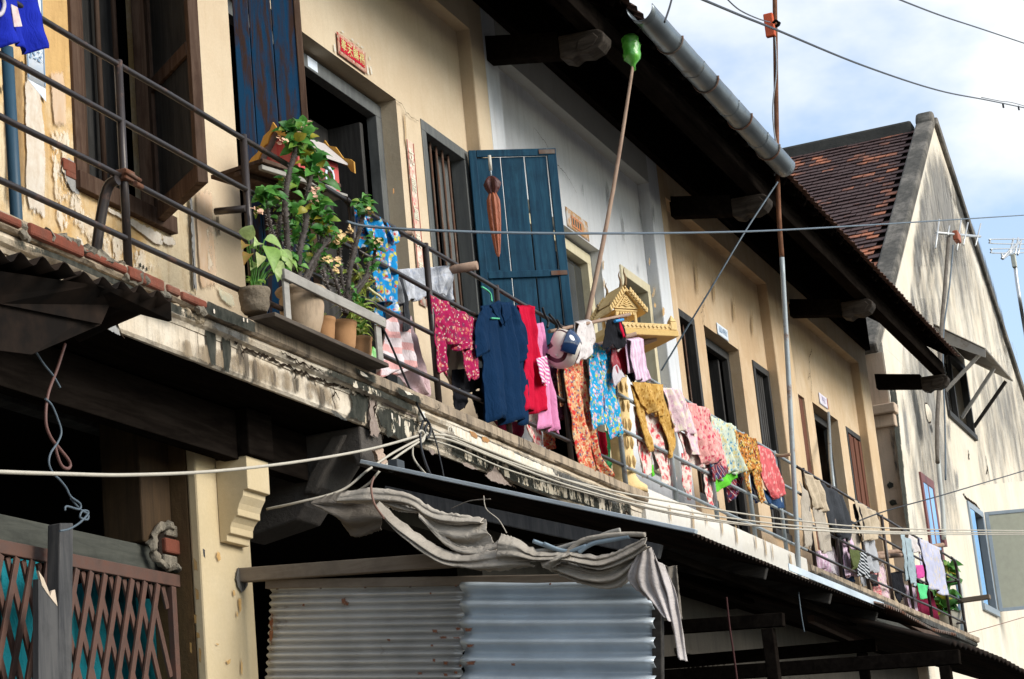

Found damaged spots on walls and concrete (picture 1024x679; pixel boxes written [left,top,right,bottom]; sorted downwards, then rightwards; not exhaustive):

peeling [0,73,234,324]
water stain [911,158,1007,352]
crack [234,341,369,405]
peeling [326,370,420,440]
water stain [184,301,632,516]
water stain [910,356,933,377]
water stain [890,390,959,531]
water stain [982,374,1024,473]